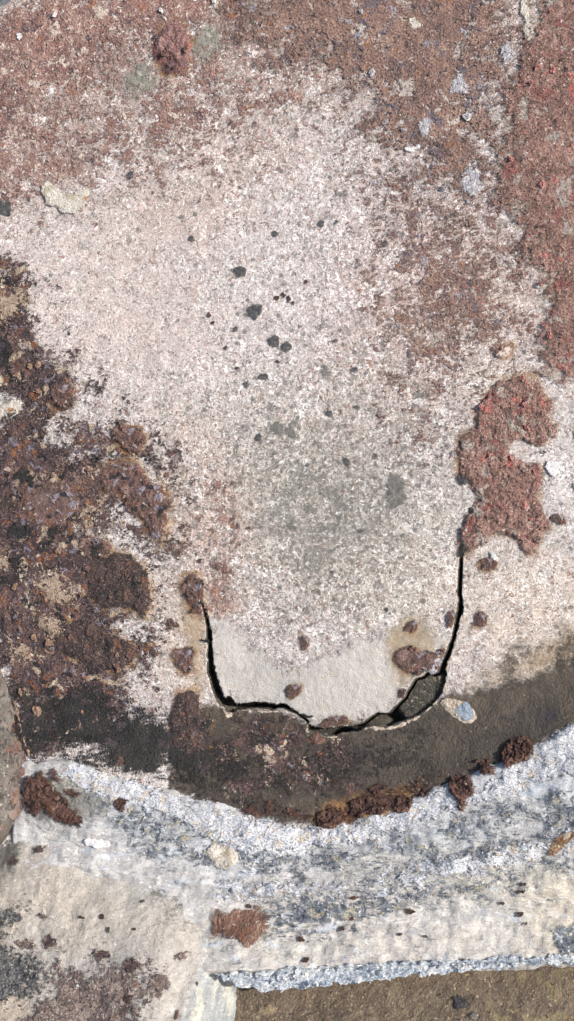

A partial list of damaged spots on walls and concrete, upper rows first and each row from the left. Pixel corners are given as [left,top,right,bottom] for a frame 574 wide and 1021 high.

corrosion [0,234,447,835]
corrosion [212,904,269,948]
corrosion [0,0,574,572]
crack [200,543,464,738]